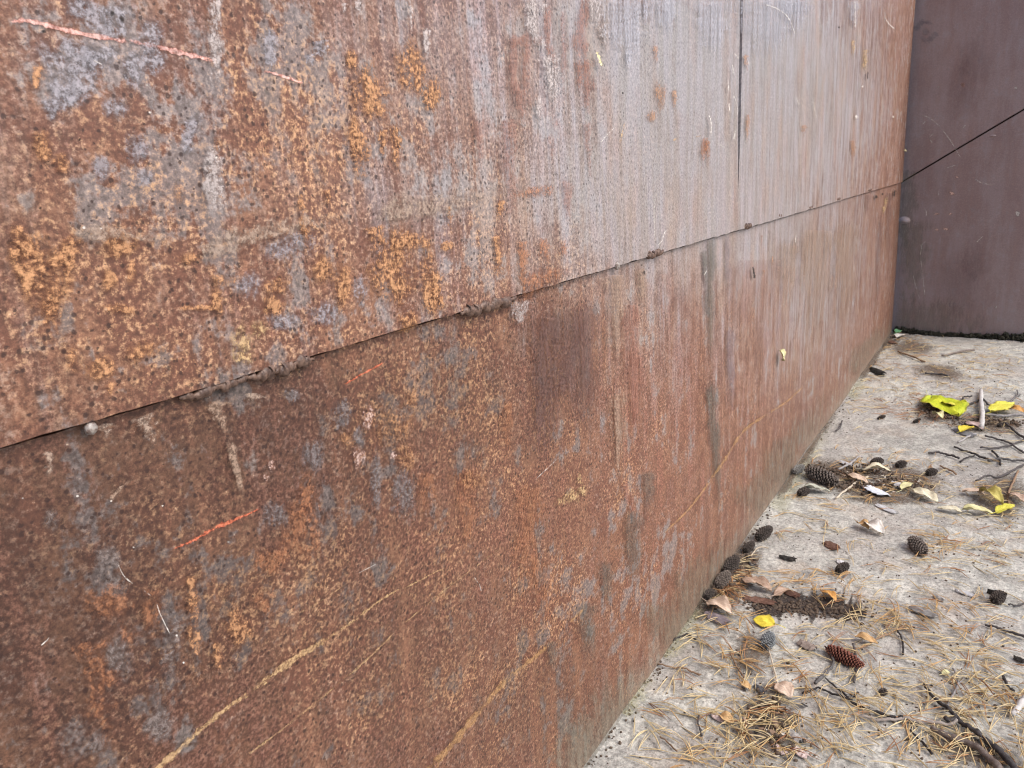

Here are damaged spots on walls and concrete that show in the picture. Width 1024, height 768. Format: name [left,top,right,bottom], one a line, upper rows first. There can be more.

corrosion [396,42,441,110]
corrosion [346,51,402,176]
corrosion [10,226,82,325]
corrosion [104,232,136,290]
corrosion [265,278,285,315]
corrosion [315,256,351,309]
corrosion [366,225,453,332]
corrosion [86,356,115,395]
water stain [614,395,627,460]
corrosion [229,445,242,486]
corrosion [187,576,201,655]
corrosion [228,609,251,644]